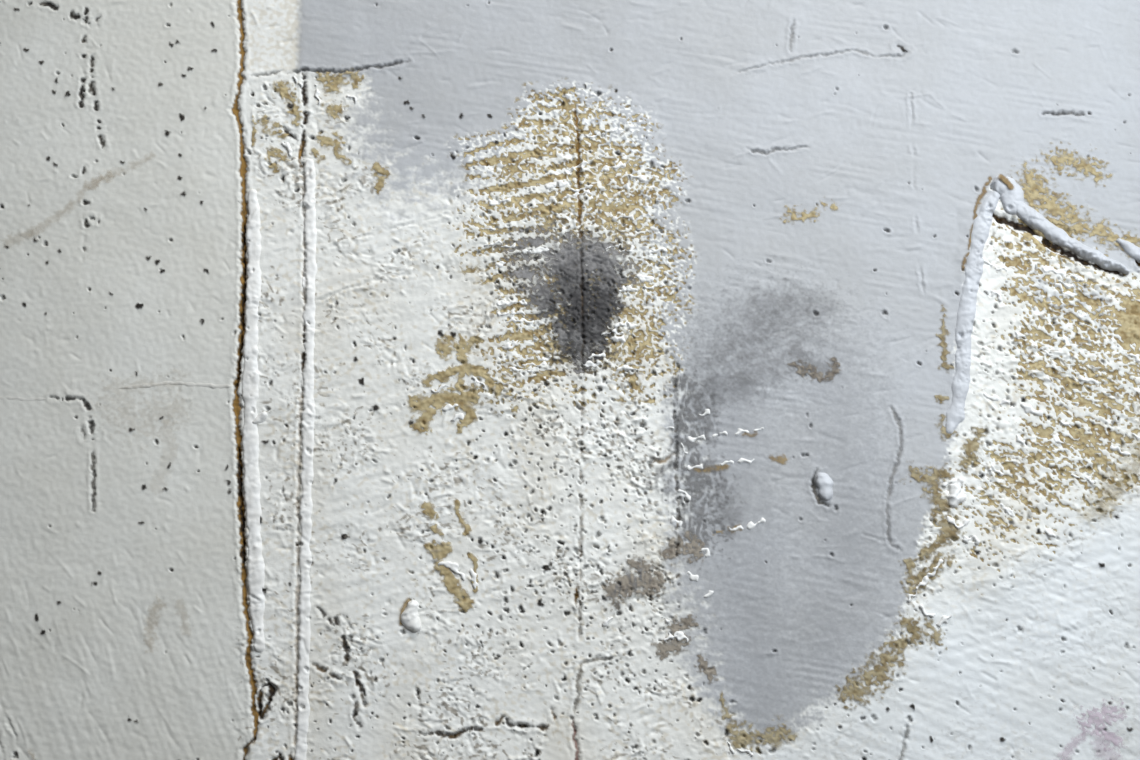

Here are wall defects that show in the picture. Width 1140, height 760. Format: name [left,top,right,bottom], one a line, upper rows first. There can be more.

crack [274,62,398,167]
peeling [409,83,694,434]
crack [56,397,95,508]
crack [232,0,293,760]
crack [299,326,307,372]
damp [553,319,606,374]
peeling [836,142,1140,710]
crack [315,607,365,727]
crack [429,657,611,760]